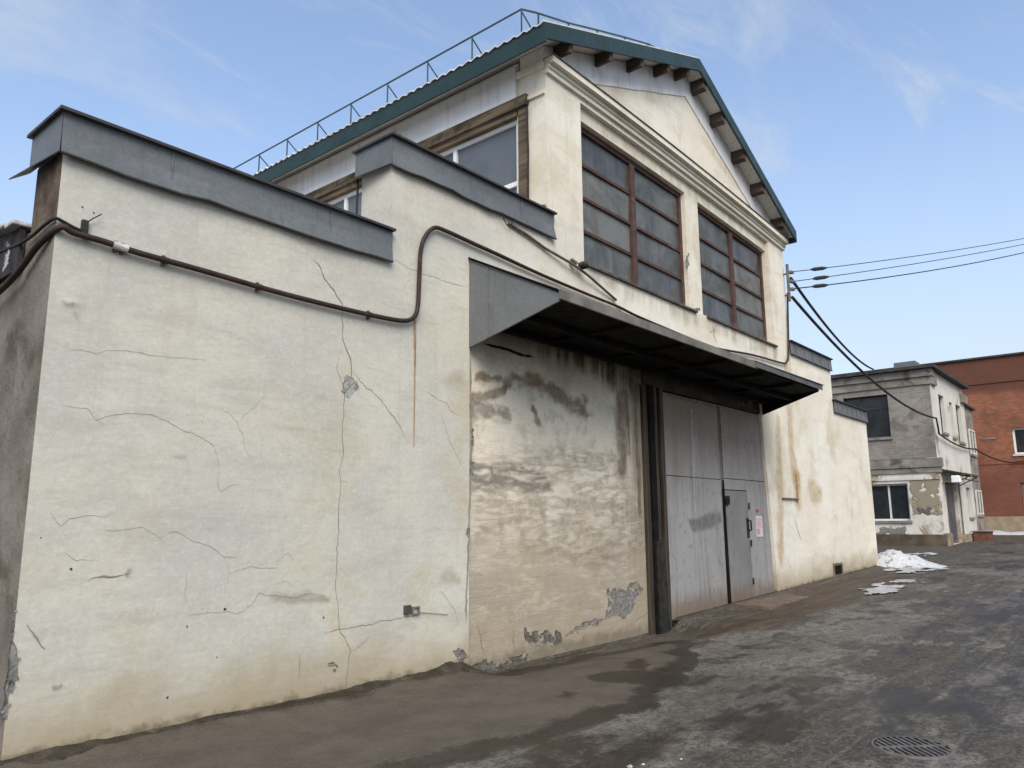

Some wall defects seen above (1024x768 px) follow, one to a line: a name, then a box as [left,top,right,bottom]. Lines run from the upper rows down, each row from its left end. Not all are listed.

spalling [341,375,359,398]
damp [470,372,587,418]
crack [52,261,416,682]
crack [426,343,533,653]
damp [617,387,641,514]
spalling [909,479,942,516]
spalling [0,610,21,720]
spalling [453,582,644,671]